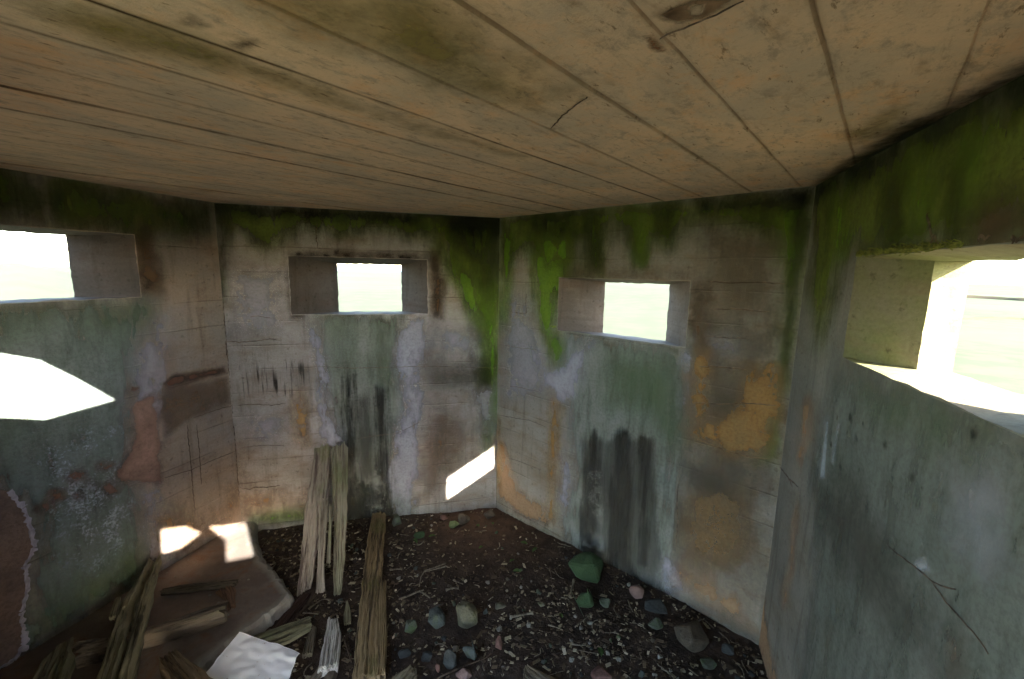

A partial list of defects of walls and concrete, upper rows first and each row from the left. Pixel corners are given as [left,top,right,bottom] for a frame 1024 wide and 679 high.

spalling [661,0,731,22]
crack [551,97,588,128]
damp [310,210,768,593]
peeling [0,489,39,669]
crack [887,545,988,654]